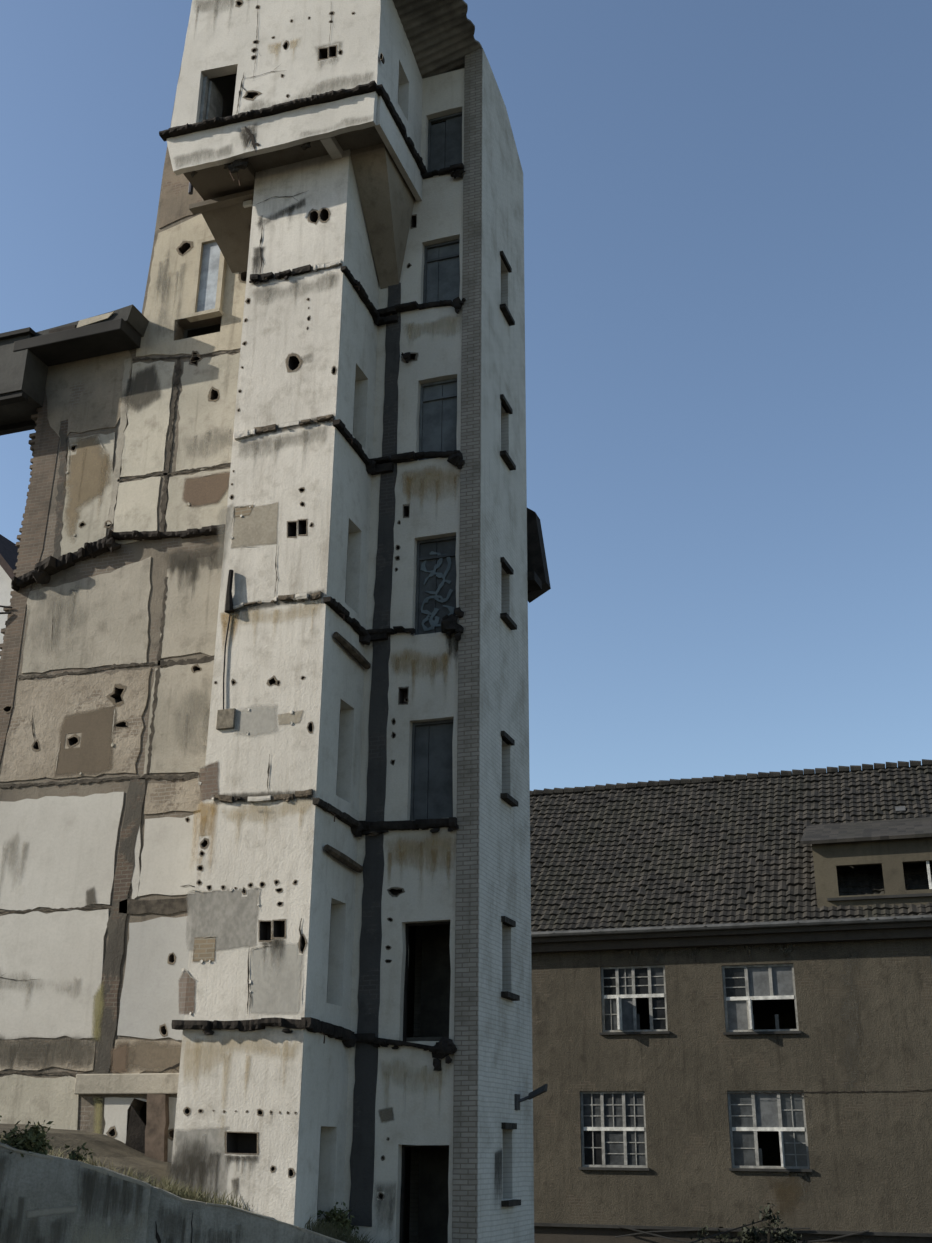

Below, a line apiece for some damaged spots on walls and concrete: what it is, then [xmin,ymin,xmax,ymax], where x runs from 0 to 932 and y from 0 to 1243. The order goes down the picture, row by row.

damp [169,545,224,582]